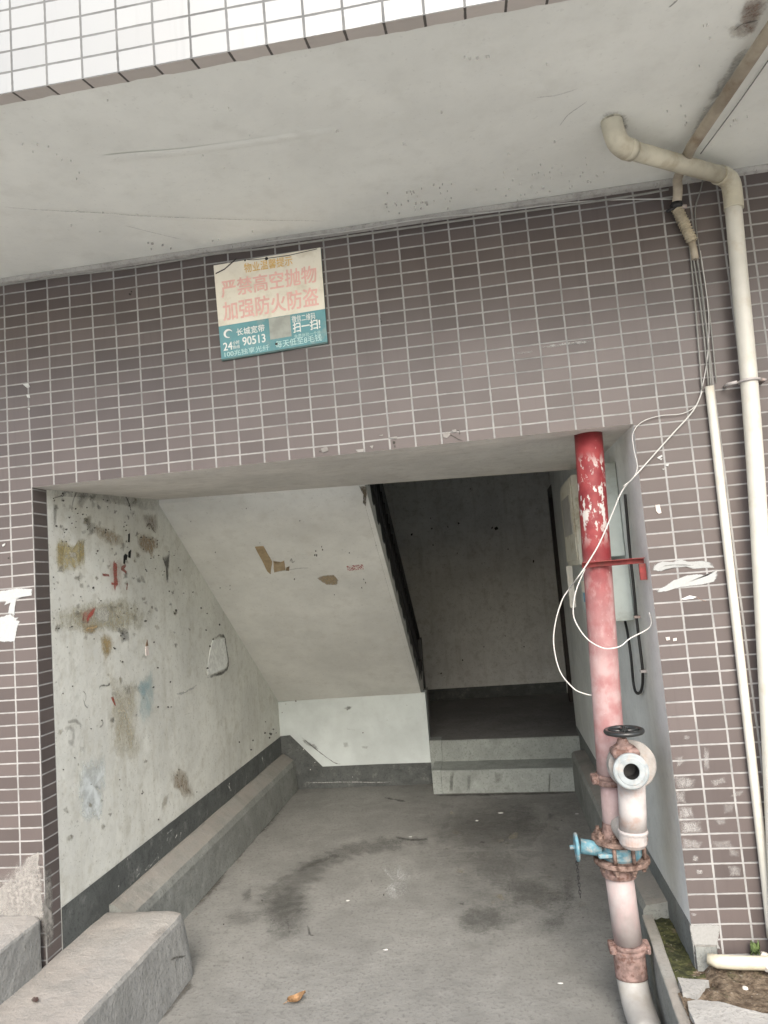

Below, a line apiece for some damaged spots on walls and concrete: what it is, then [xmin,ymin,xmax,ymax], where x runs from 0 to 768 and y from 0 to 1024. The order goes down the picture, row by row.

peeling [55,499,193,594]
peeling [255,546,295,580]